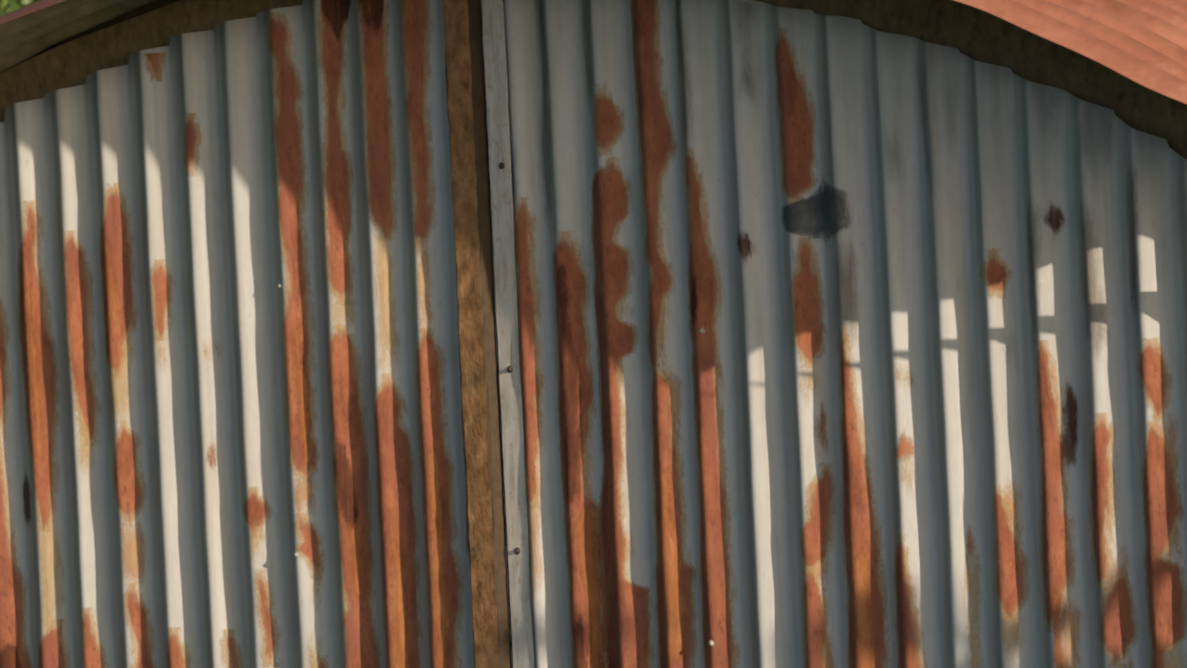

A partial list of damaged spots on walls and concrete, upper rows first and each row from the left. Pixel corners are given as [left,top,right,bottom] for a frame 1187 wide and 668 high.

corrosion [0,182,189,668]
corrosion [268,13,323,591]
corrosion [318,0,463,668]
corrosion [514,198,543,577]
corrosion [553,0,738,668]
corrosion [774,31,816,206]
corrosion [790,238,825,385]
corrosion [800,327,925,668]
corrosion [993,340,1080,668]
corrosion [1089,339,1187,668]